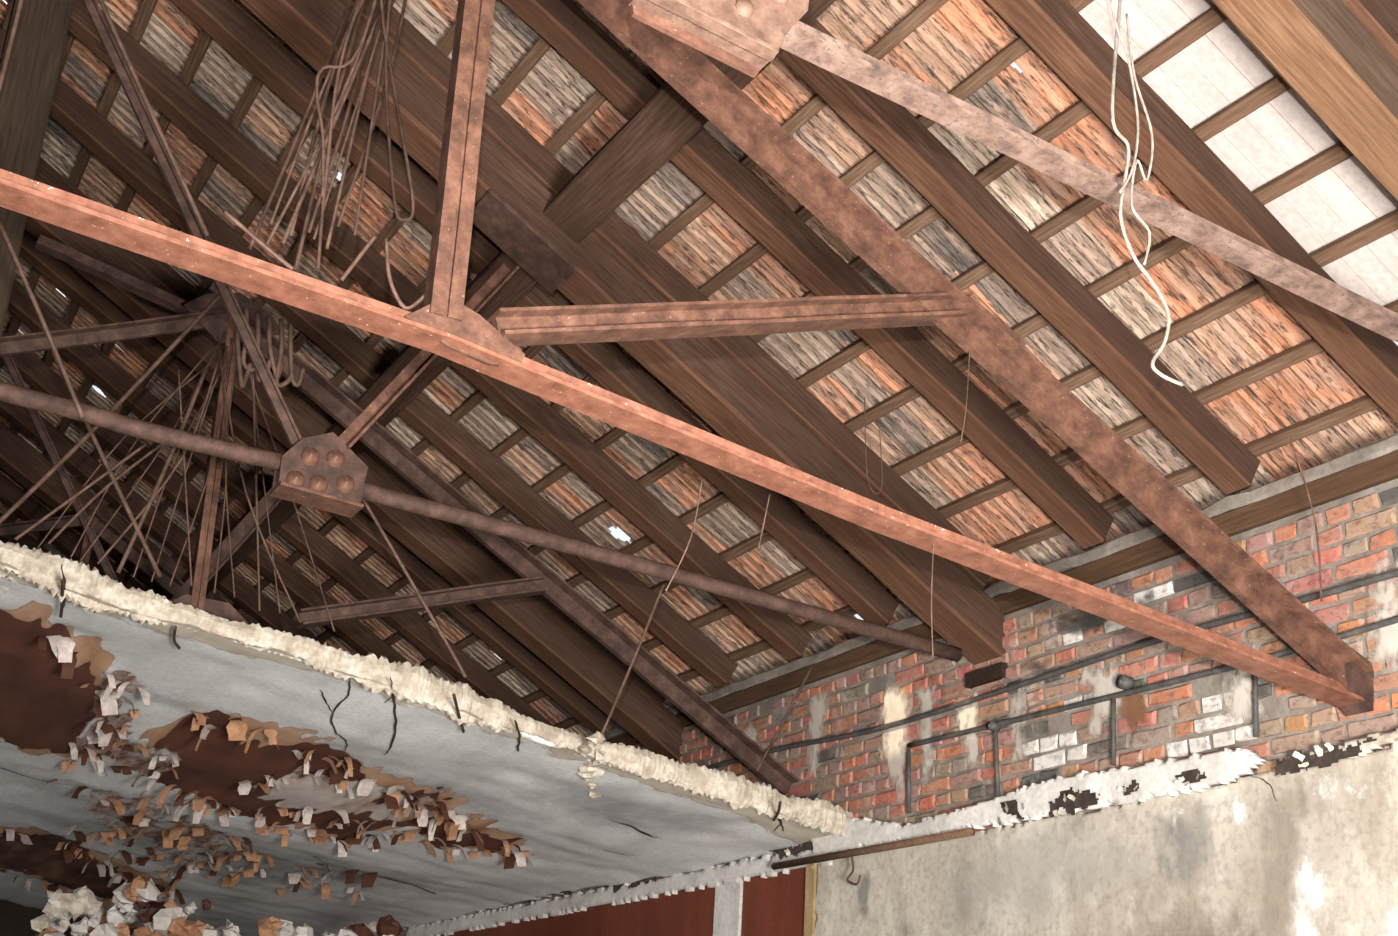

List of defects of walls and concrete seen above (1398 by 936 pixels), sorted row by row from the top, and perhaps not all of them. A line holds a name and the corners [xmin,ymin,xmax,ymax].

peeling [0,541,853,936]
spalling [1275,737,1377,776]
spalling [1174,769,1207,786]
spalling [1049,779,1139,817]